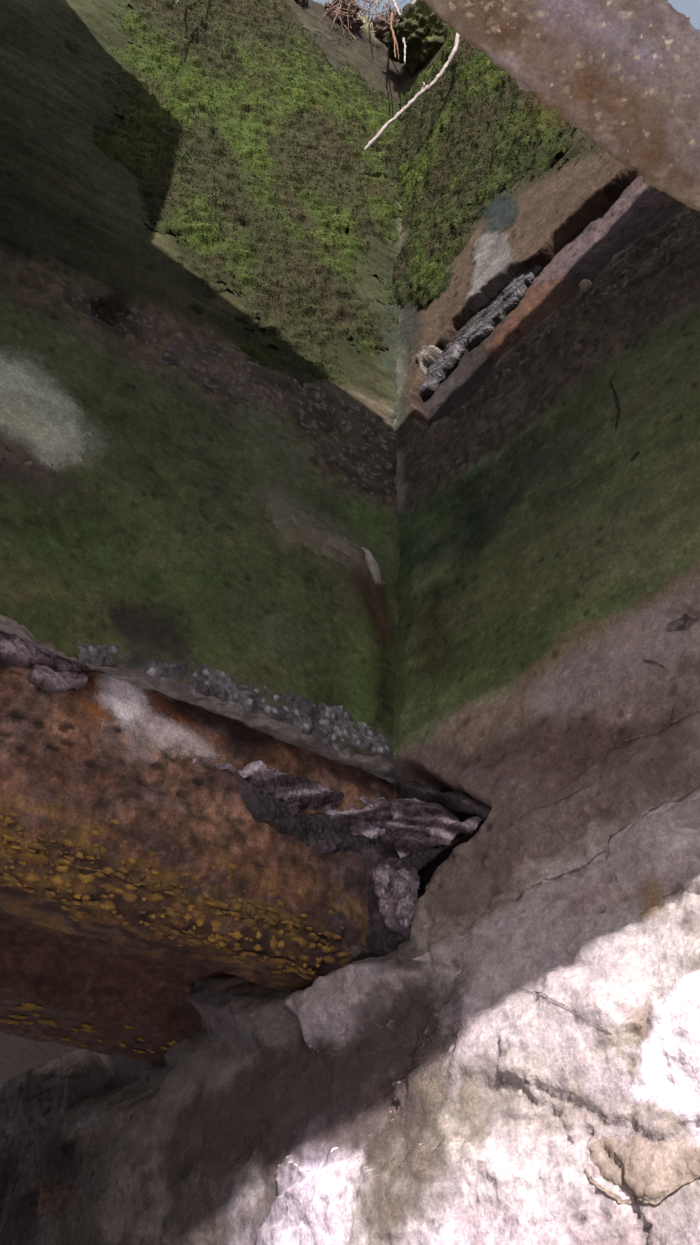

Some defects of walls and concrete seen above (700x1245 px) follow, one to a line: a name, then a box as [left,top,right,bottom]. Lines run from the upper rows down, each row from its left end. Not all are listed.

crack [416,783,700,955]